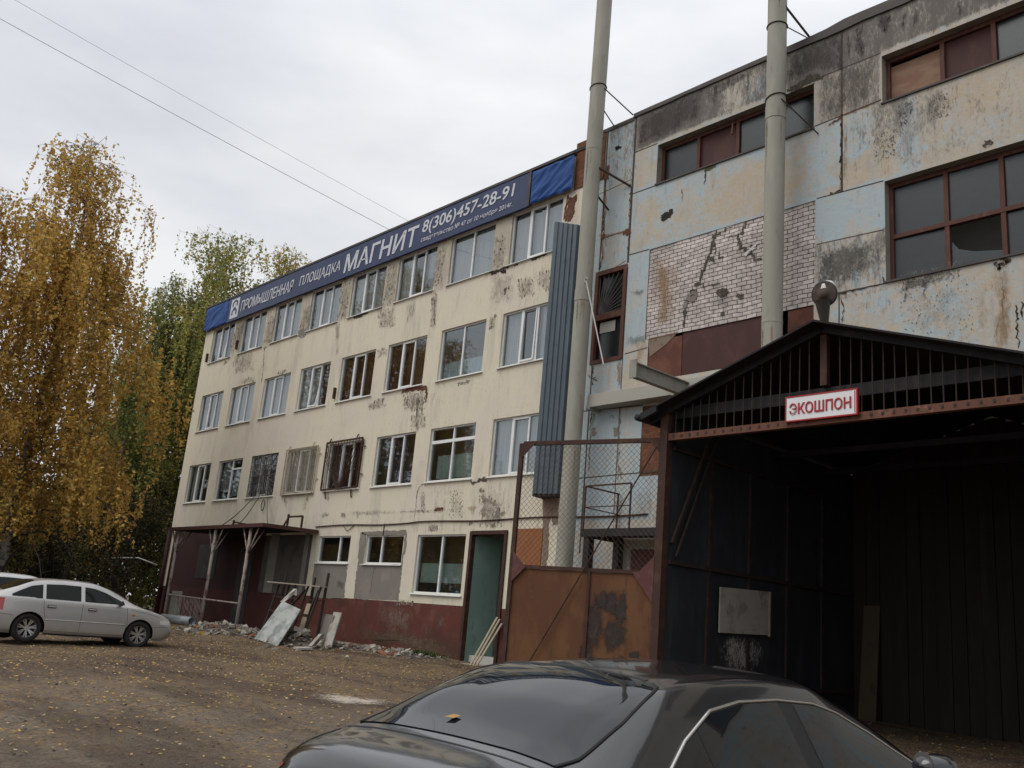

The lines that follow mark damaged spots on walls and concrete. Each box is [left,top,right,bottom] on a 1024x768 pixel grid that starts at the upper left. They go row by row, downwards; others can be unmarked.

damp [640,71,749,142]
flaking render [563,140,587,223]
flaking render [600,132,610,181]
spalling [489,235,551,329]
crack [683,221,762,327]
damp [818,241,878,281]
spalling [402,385,428,431]
peeling [400,477,503,527]